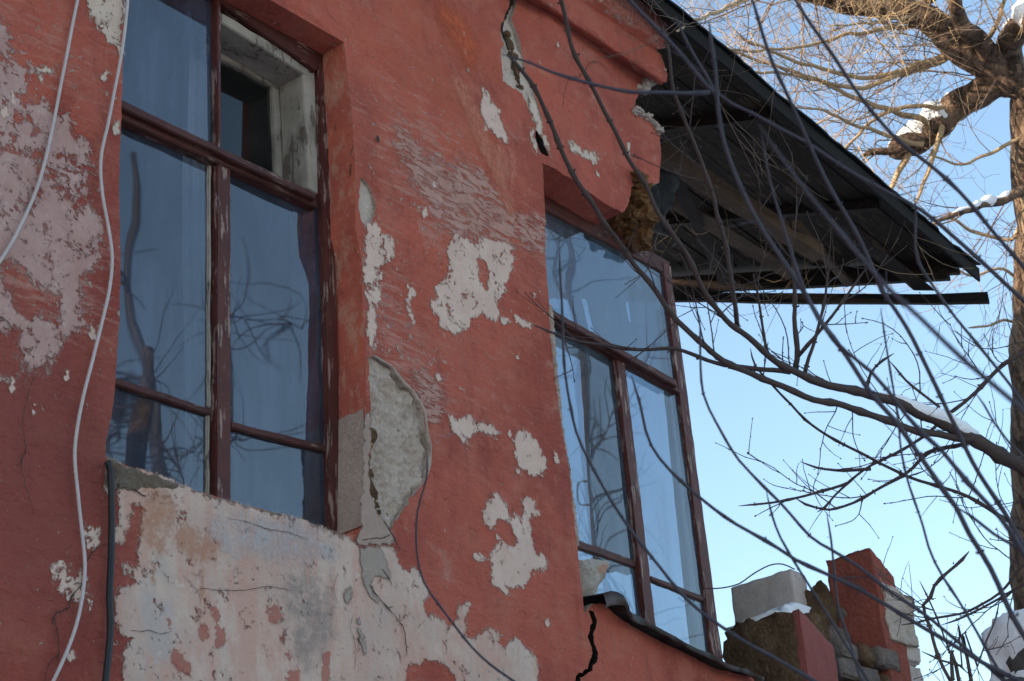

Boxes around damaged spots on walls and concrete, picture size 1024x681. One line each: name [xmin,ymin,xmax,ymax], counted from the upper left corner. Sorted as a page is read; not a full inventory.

peeling [87,0,126,56]
peeling [481,87,509,143]
peeling [527,94,552,158]
peeling [0,14,105,394]
peeling [391,124,548,336]
peeling [103,181,579,681]
peeling [50,560,93,611]